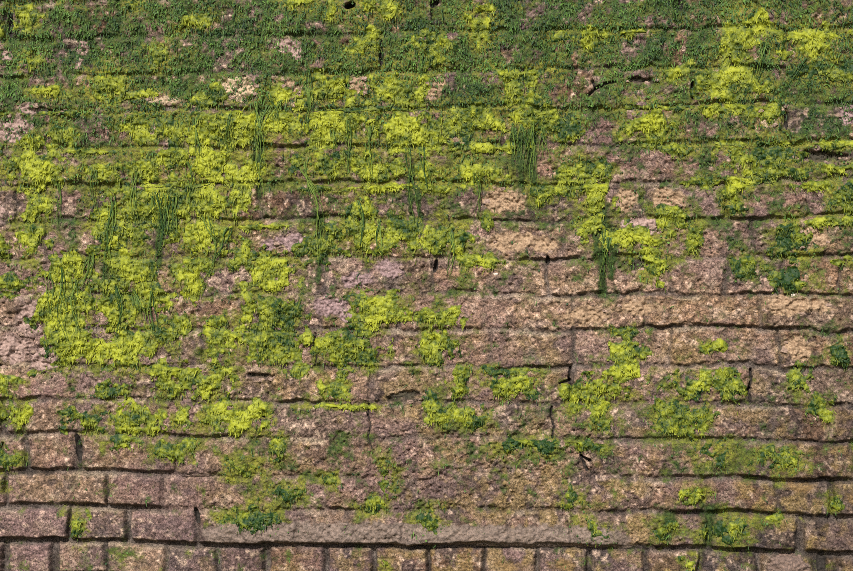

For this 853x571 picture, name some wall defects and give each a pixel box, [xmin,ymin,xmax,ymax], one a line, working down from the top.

crack [365,403,373,449]
crack [550,366,571,439]